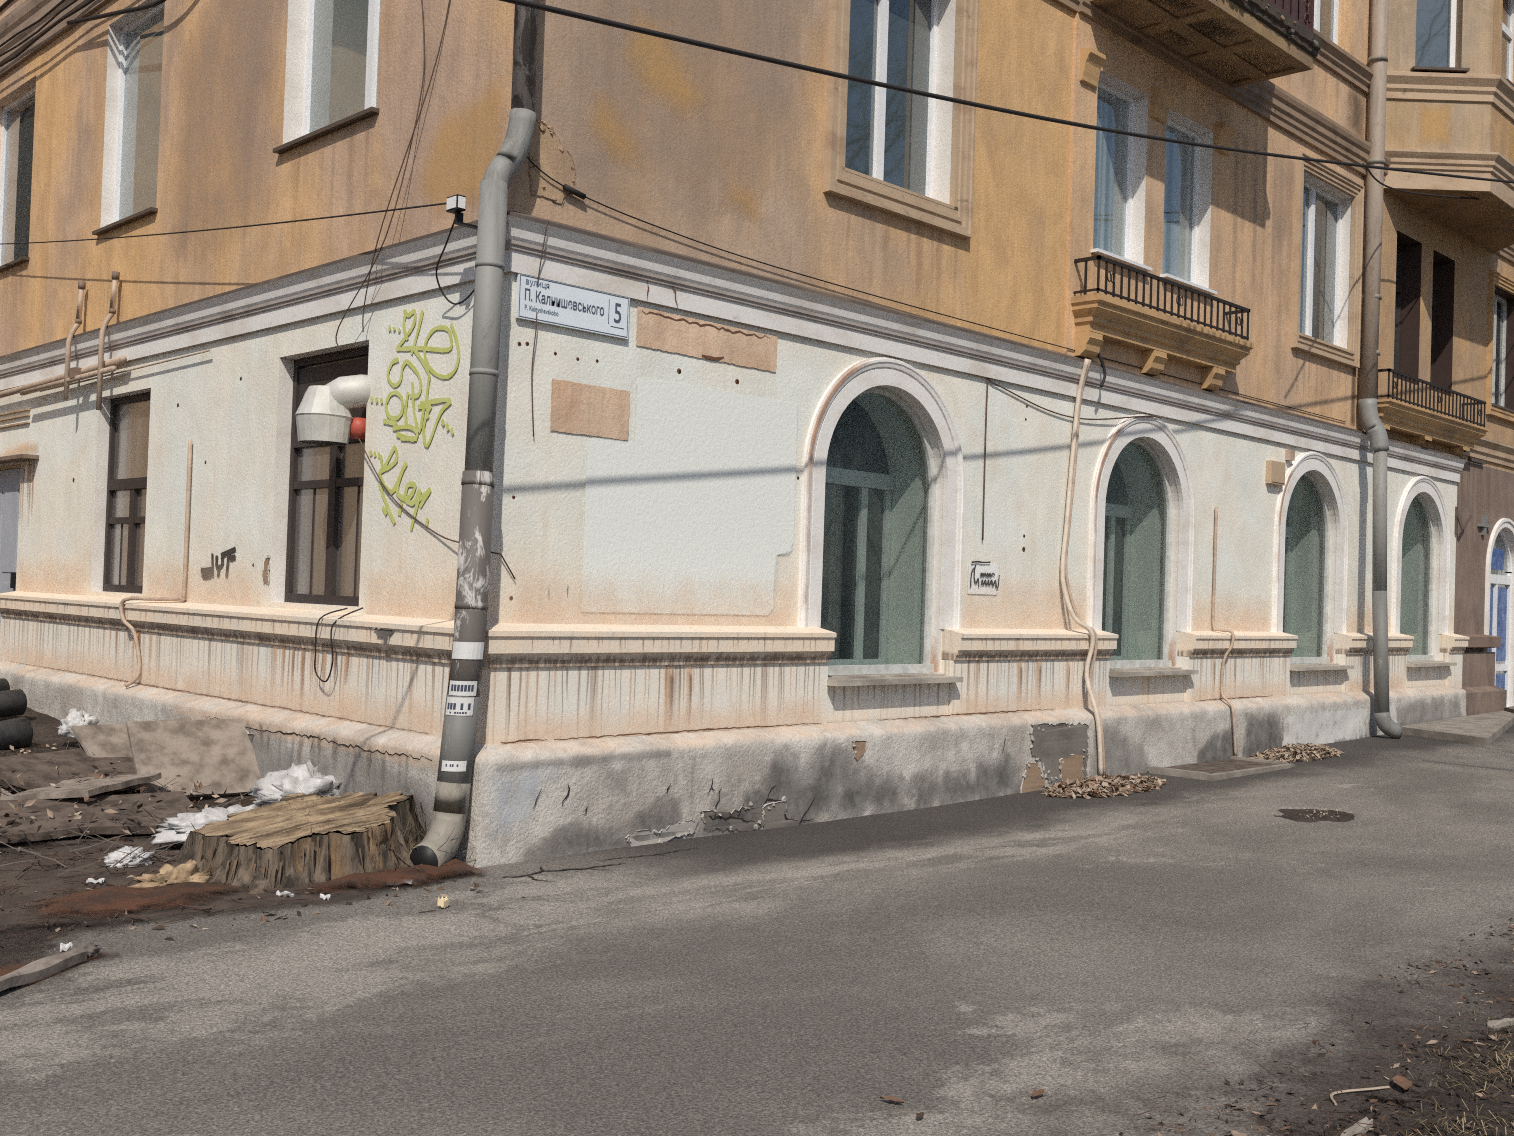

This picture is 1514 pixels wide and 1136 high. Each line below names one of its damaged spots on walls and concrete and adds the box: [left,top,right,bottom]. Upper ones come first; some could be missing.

peeling [528,117,576,203]
rust [283,647,304,685]
damp [519,751,669,765]
spalling [852,740,867,762]
damp [703,752,1021,836]
spalling [1020,721,1089,793]
damp [536,805,677,860]
crack [505,779,815,882]